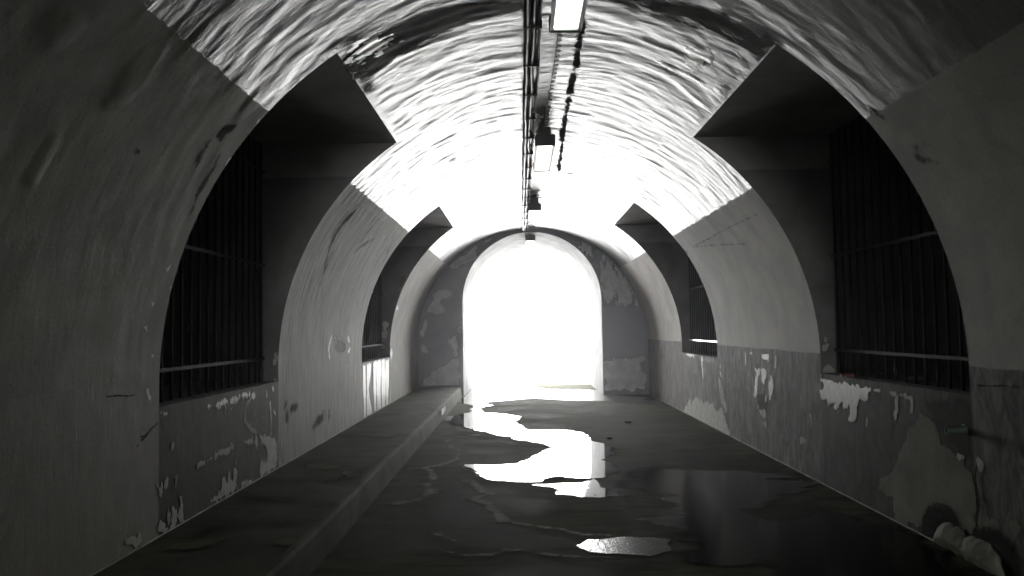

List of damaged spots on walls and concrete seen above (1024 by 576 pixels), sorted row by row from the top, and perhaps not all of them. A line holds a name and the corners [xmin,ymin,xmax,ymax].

peeling [604,356,646,392]
peeling [754,368,774,427]
peeling [194,386,282,502]
spalling [819,364,1022,544]
peeling [157,476,184,533]